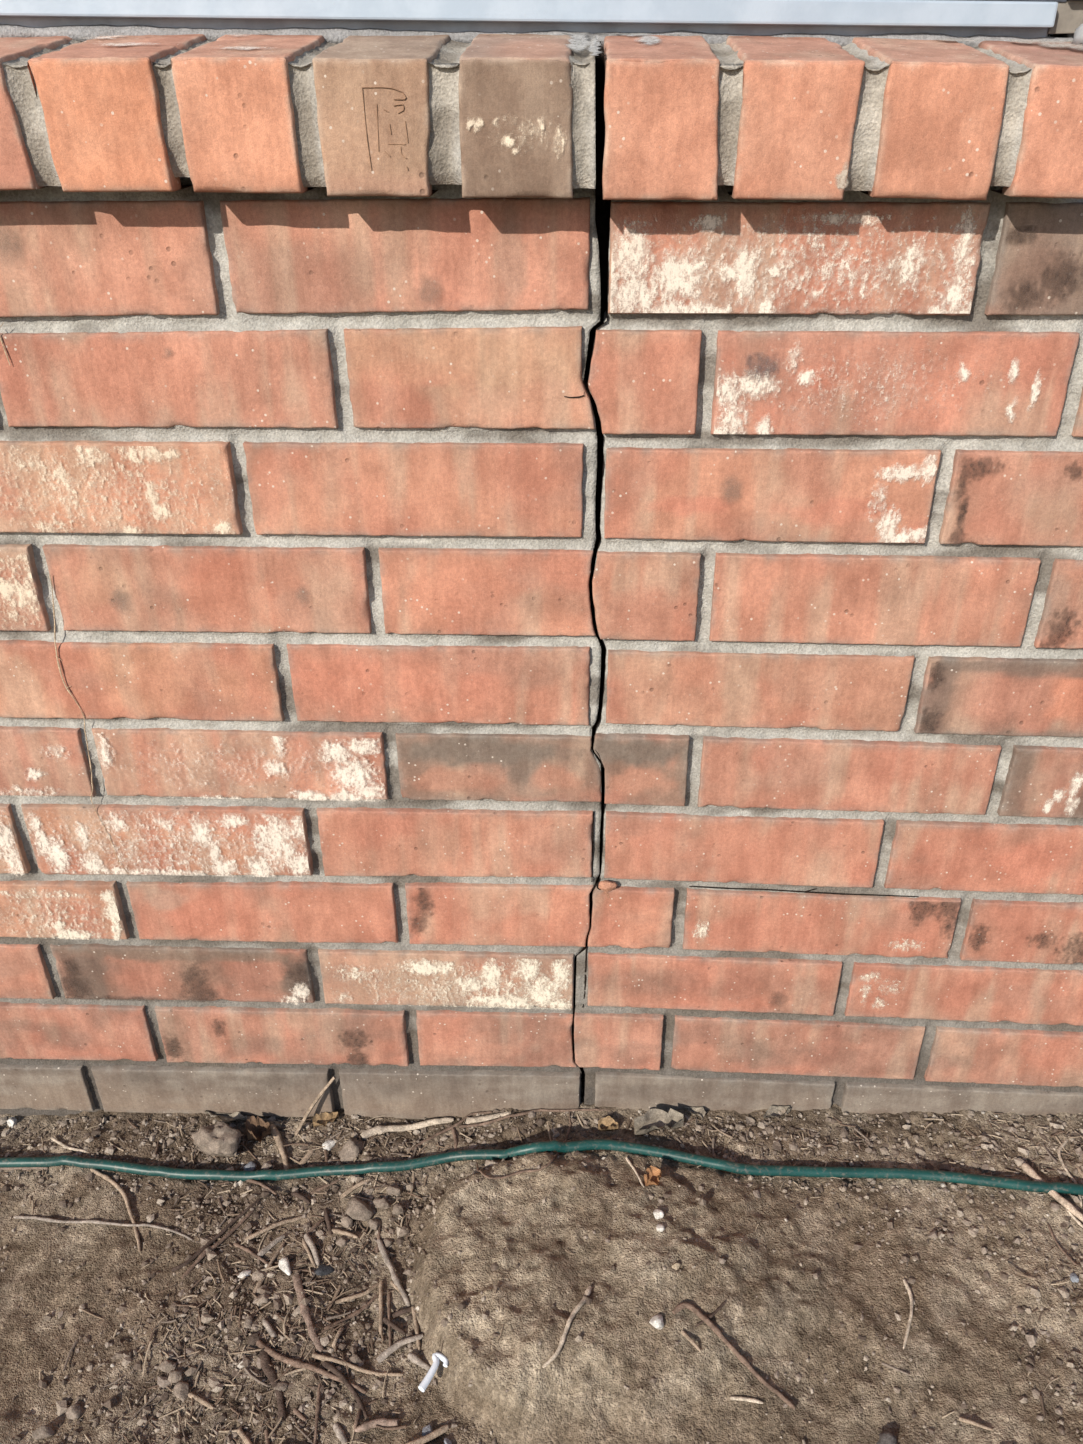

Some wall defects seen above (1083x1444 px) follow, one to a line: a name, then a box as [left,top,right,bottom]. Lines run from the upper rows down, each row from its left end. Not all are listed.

water stain [610,206,976,314]
water stain [713,348,848,434]
water stain [1006,372,1041,422]
water stain [0,445,230,534]
water stain [868,454,937,543]
crack [564,41,611,1096]
water stain [97,733,113,766]
water stain [262,736,385,801]
water stain [0,768,309,877]
water stain [0,888,122,941]
water stain [337,958,572,1010]